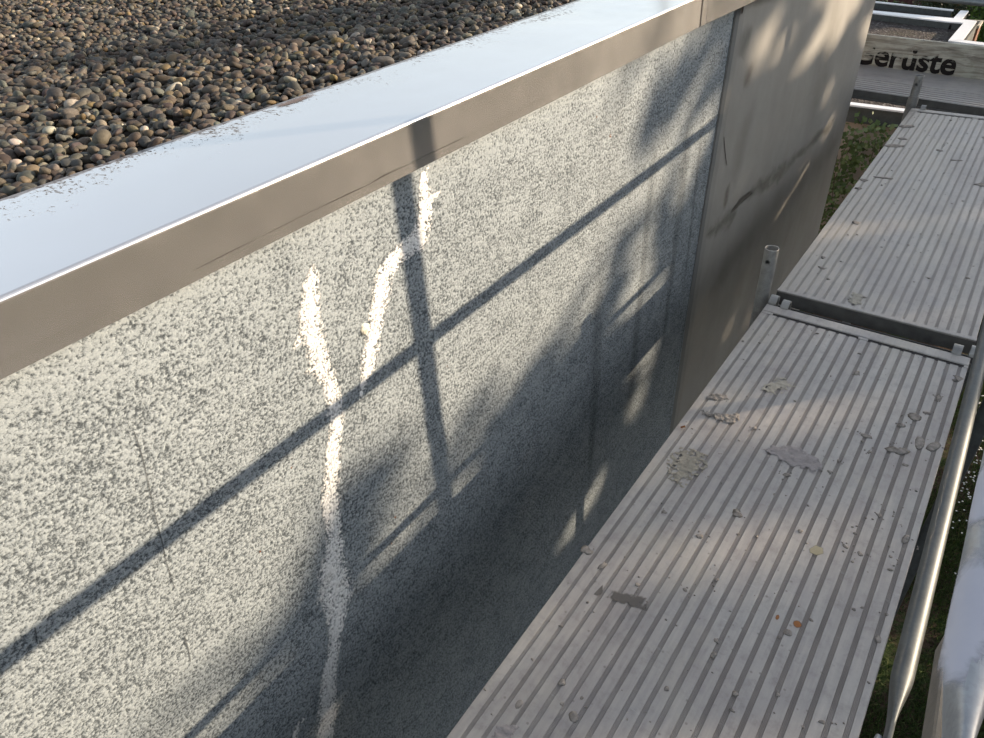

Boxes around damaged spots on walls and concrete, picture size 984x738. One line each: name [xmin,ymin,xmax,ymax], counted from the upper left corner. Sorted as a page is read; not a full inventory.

crack [292,166,441,738]